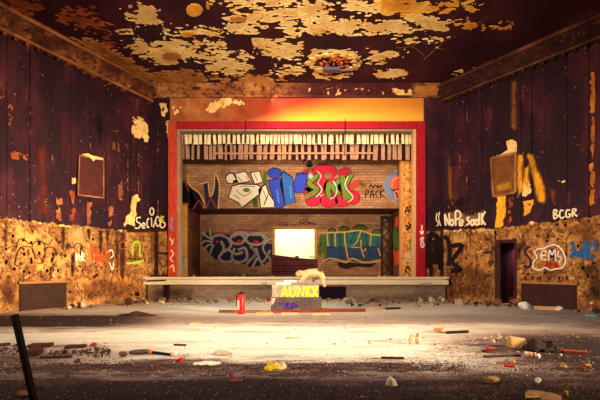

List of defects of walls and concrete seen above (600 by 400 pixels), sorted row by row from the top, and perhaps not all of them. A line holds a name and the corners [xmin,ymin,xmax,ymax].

peeling [55,0,513,83]
peeling [131,116,149,142]
peeling [158,103,181,137]
peeling [206,98,245,113]
flaking render [4,219,62,275]
peeling [117,162,140,232]
flaking render [443,195,513,288]
flaking render [520,181,584,266]
flaking render [76,265,107,291]
flaking render [108,276,143,297]